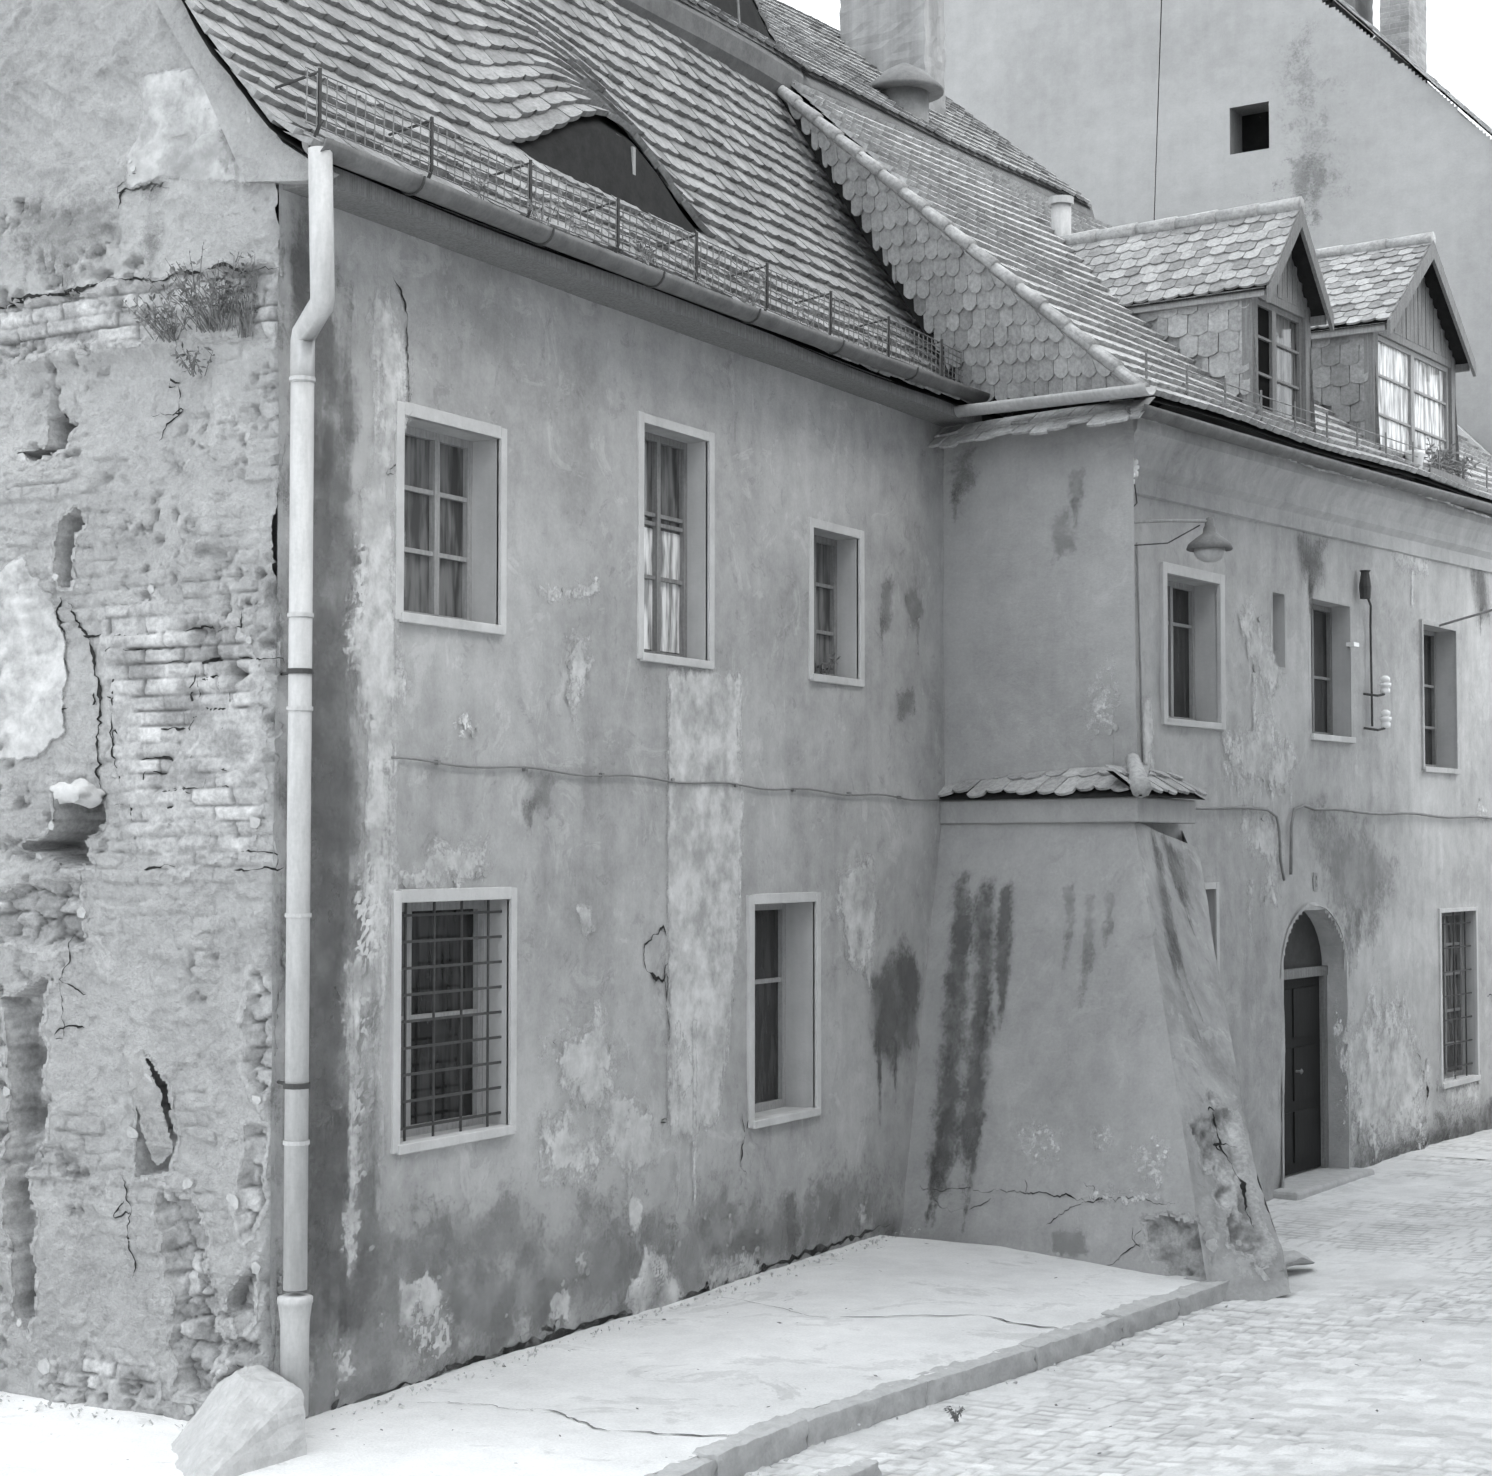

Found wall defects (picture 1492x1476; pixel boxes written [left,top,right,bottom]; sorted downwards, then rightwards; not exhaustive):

crack [0,262,279,309]
spalling [10,407,79,466]
spalling [47,502,87,592]
flaking render [0,584,269,961]
crack [56,598,285,820]
crack [210,836,284,872]
damp [872,945,920,1109]
damp [926,877,1012,1217]
flaking render [38,962,286,1416]
crack [920,1180,1173,1266]
spalling [1138,1088,1278,1282]
crack [331,1224,890,1410]